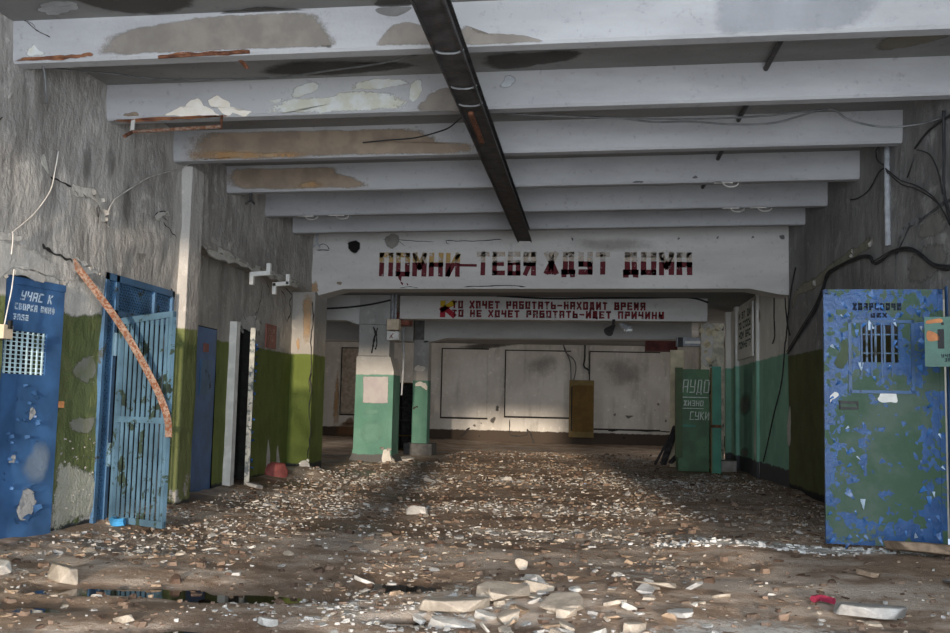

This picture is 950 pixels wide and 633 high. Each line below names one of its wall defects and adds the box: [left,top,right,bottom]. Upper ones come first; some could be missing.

damp [78,0,333,55]
damp [375,0,429,45]
rust [18,52,93,61]
rust [161,49,246,58]
rust [114,115,227,123]
peeling [165,95,251,116]
damp [265,62,459,114]
peeling [3,384,98,530]